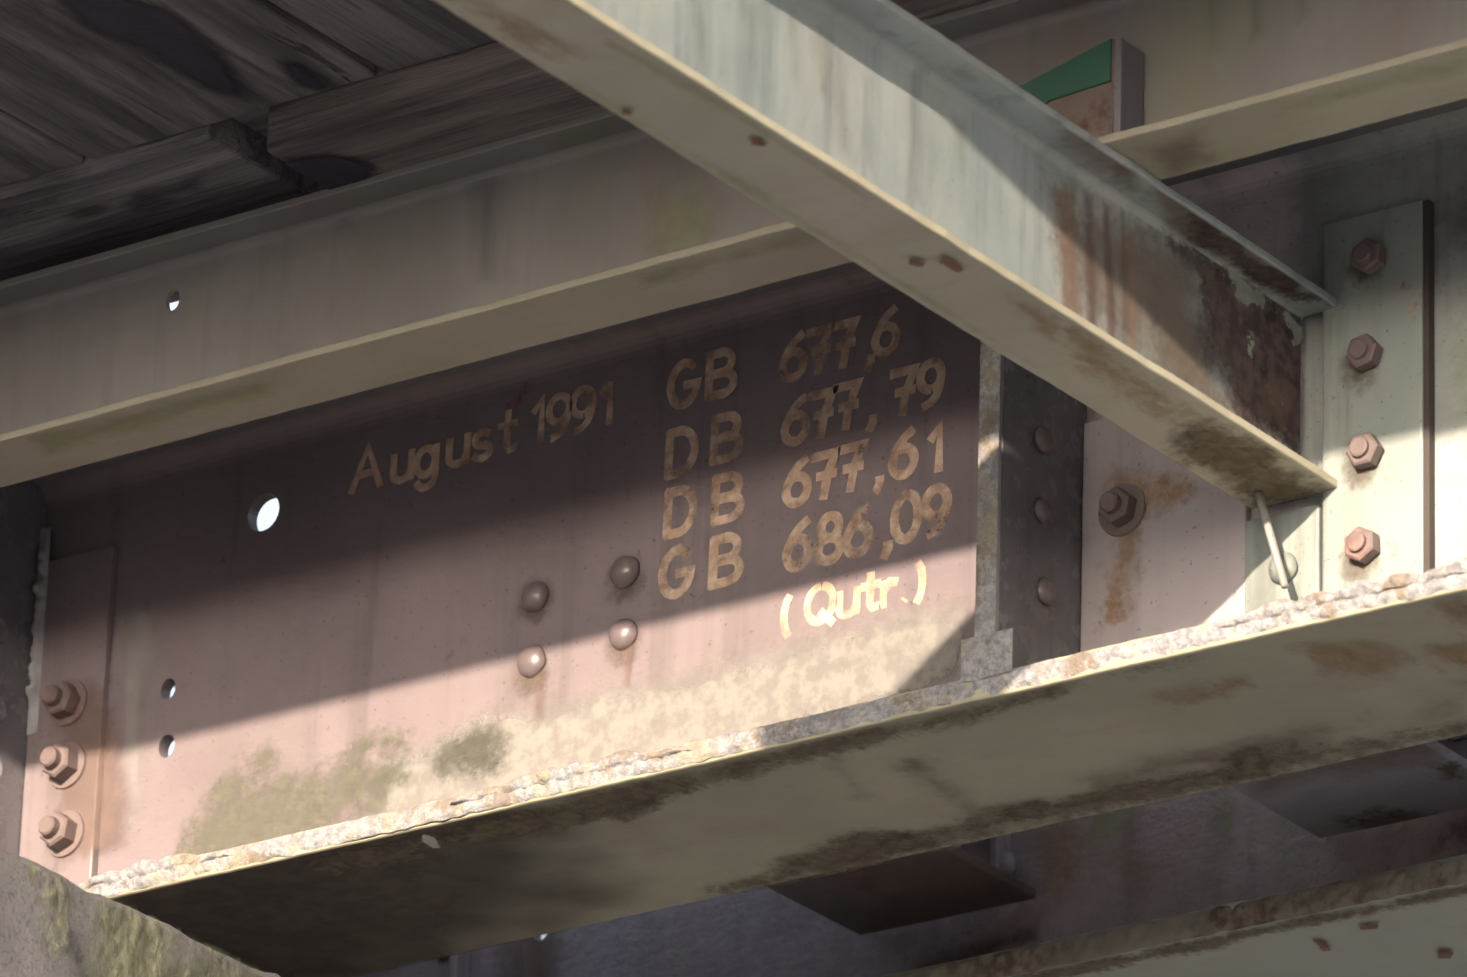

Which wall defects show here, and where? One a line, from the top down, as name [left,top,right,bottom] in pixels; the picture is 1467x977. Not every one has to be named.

corrosion [1062,209,1320,455]
peeling [1217,557,1467,628]
corrosion [1345,557,1371,577]
peeling [960,628,1013,683]
leakage [381,615,964,813]
leakage [1343,810,1426,829]
leakage [112,810,574,977]